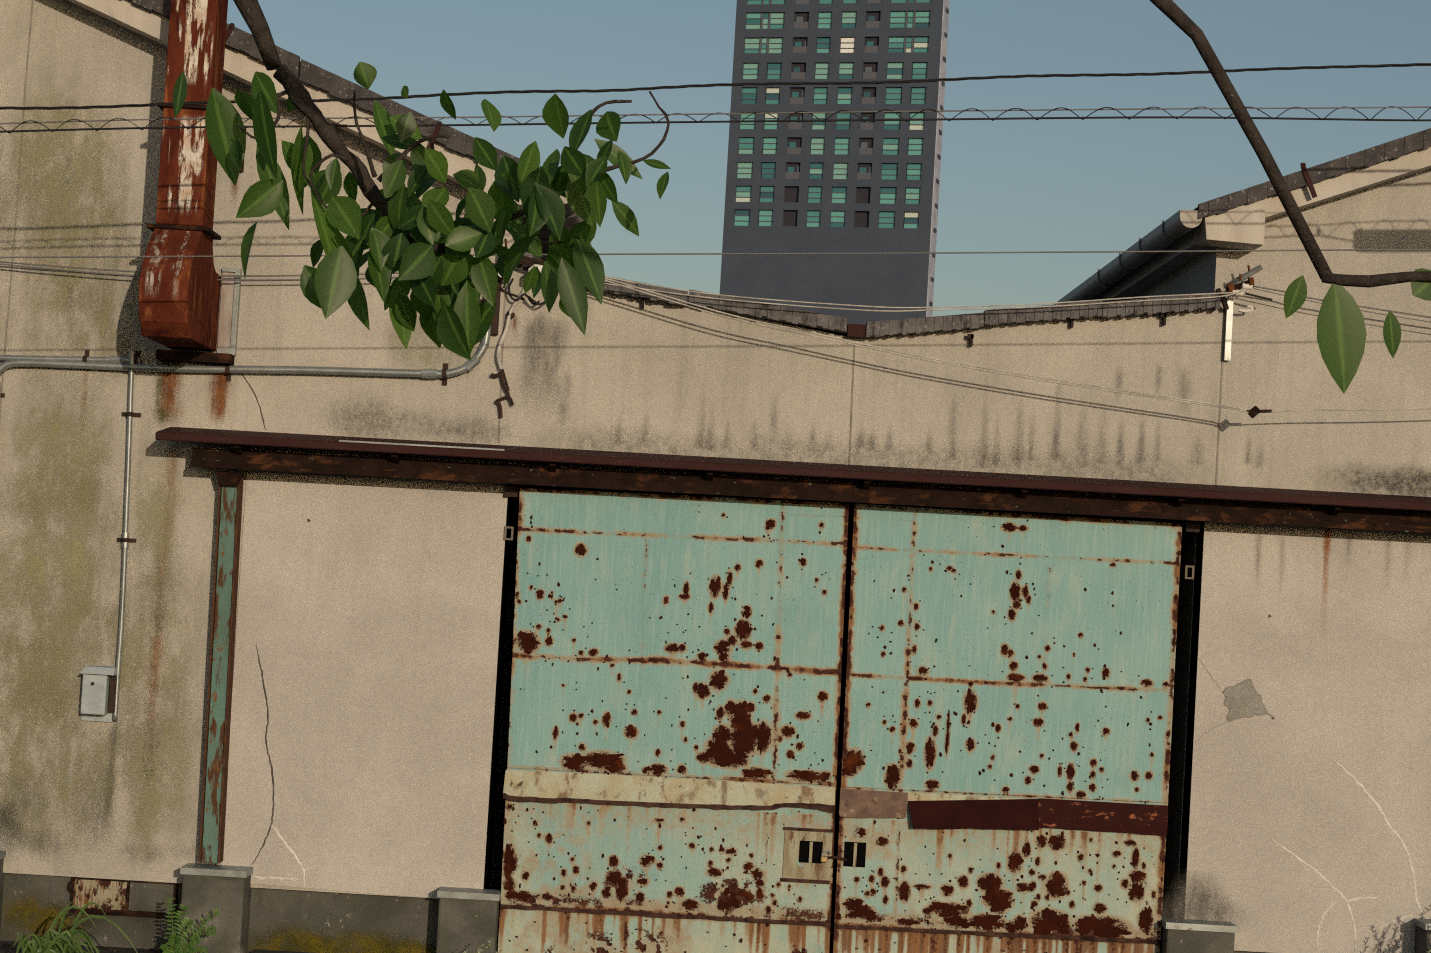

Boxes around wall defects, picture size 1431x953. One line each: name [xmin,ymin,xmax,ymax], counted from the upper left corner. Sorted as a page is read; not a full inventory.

corrosion [212,364,228,417]
corrosion [993,513,1041,548]
corrosion [987,557,1040,629]
corrosion [516,553,872,787]
corrosion [868,600,1109,799]
corrosion [1002,633,1170,756]
spalling [1196,660,1275,742]
crack [251,644,305,886]
corrosion [503,804,802,947]
corrosion [845,820,889,850]
corrosion [831,831,1156,952]
crack [1272,759,1423,951]